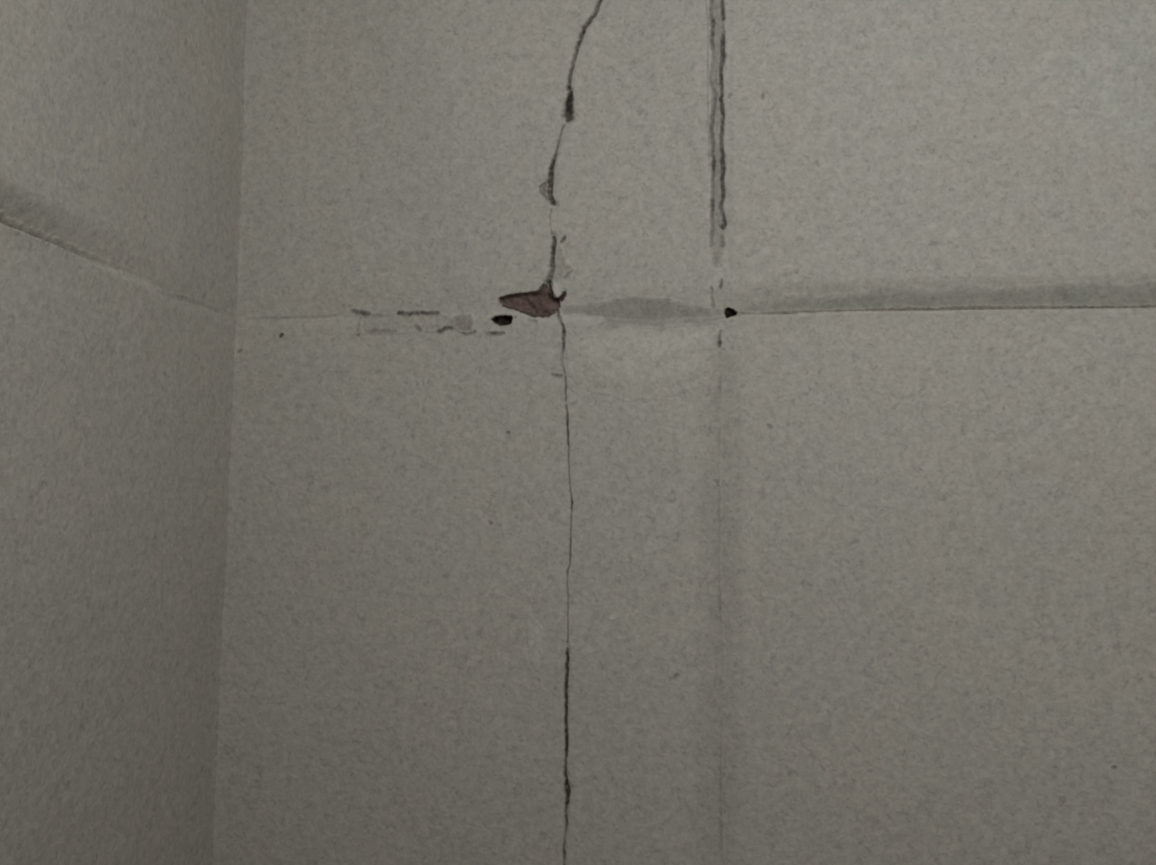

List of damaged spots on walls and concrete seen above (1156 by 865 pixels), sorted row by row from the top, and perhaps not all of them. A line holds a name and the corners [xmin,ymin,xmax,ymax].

crack [705,0,728,248]
spalling [351,279,567,337]
crack [538,0,604,865]